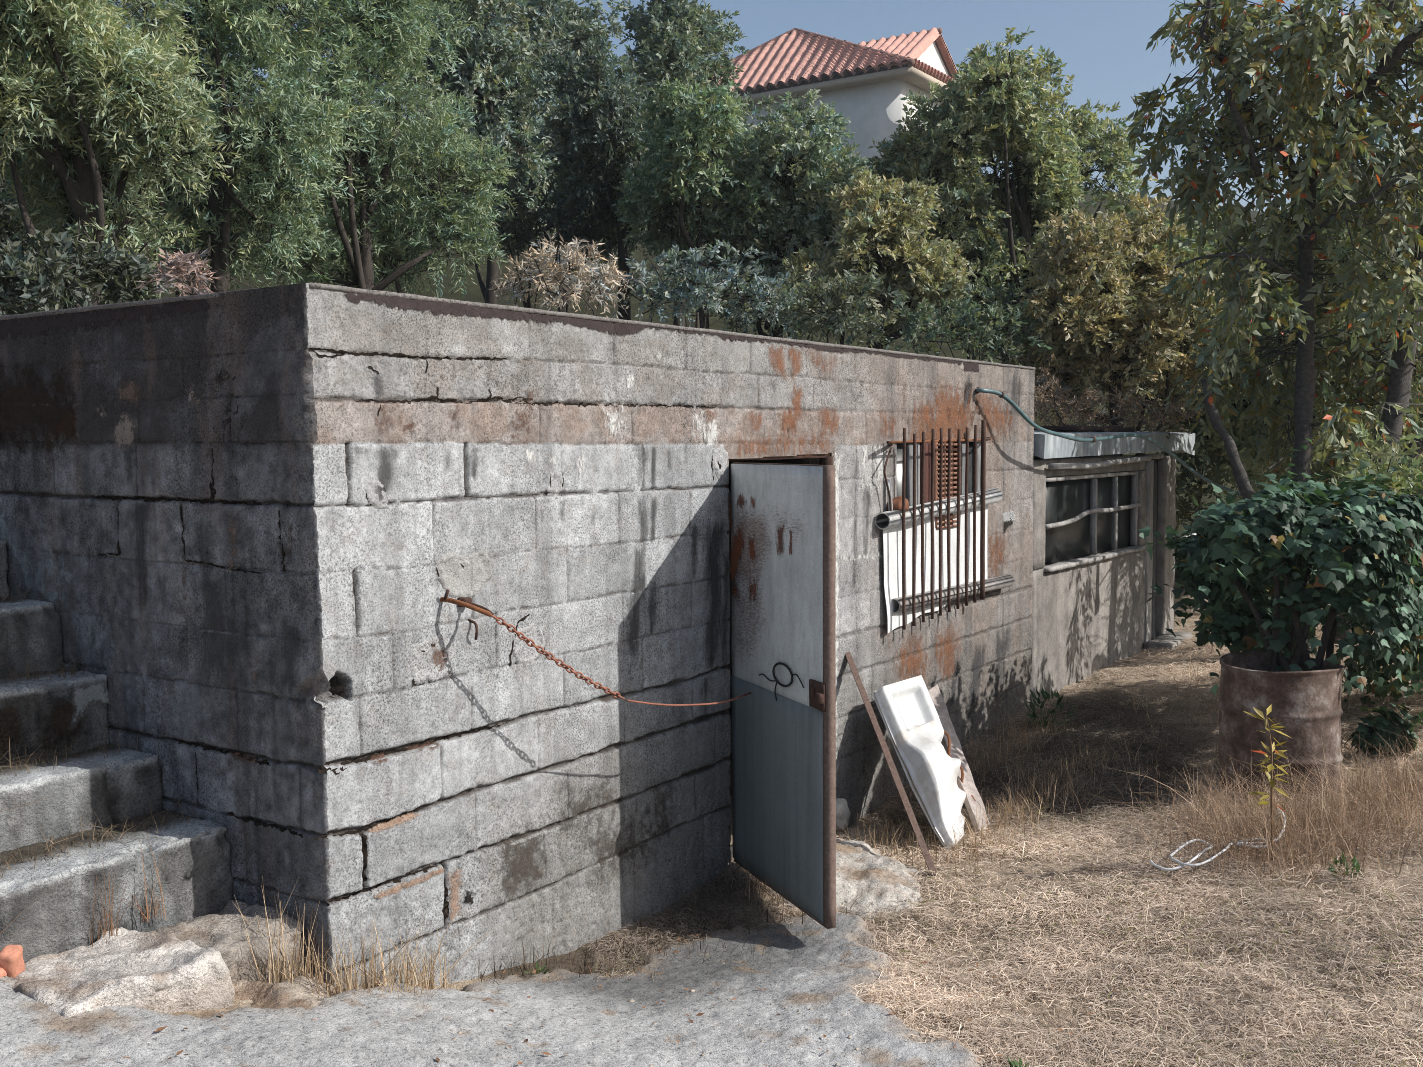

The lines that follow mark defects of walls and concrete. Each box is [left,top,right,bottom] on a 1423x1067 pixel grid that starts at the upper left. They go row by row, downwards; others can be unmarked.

rust [739,348,839,455]
rust [911,386,1012,440]
damp [0,509,108,658]
spalling [313,677,346,709]
damp [627,447,657,655]
damp [692,524,729,696]
rust [730,495,756,601]
rust [776,525,792,555]
rust [899,628,961,679]
rust [990,535,1003,573]